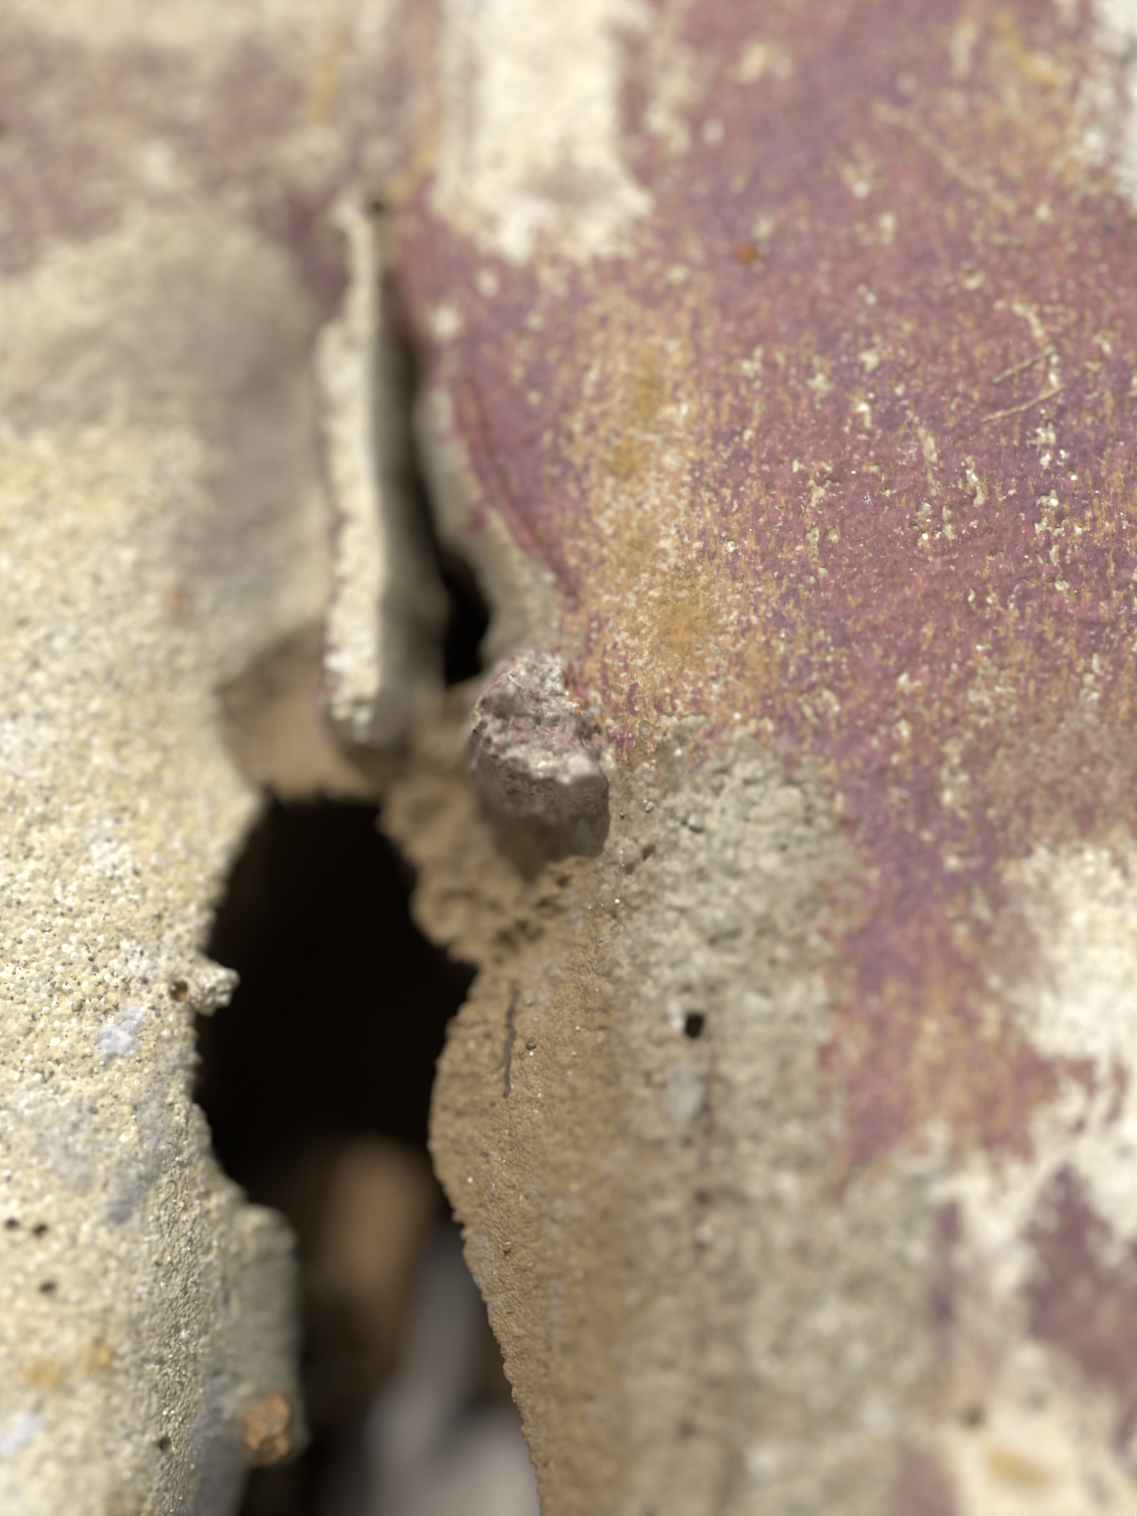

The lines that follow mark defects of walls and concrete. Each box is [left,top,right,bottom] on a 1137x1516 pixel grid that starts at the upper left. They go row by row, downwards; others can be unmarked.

crack [405,335,497,711]
peeling [244,0,1137,1516]
crack [502,987,516,1097]